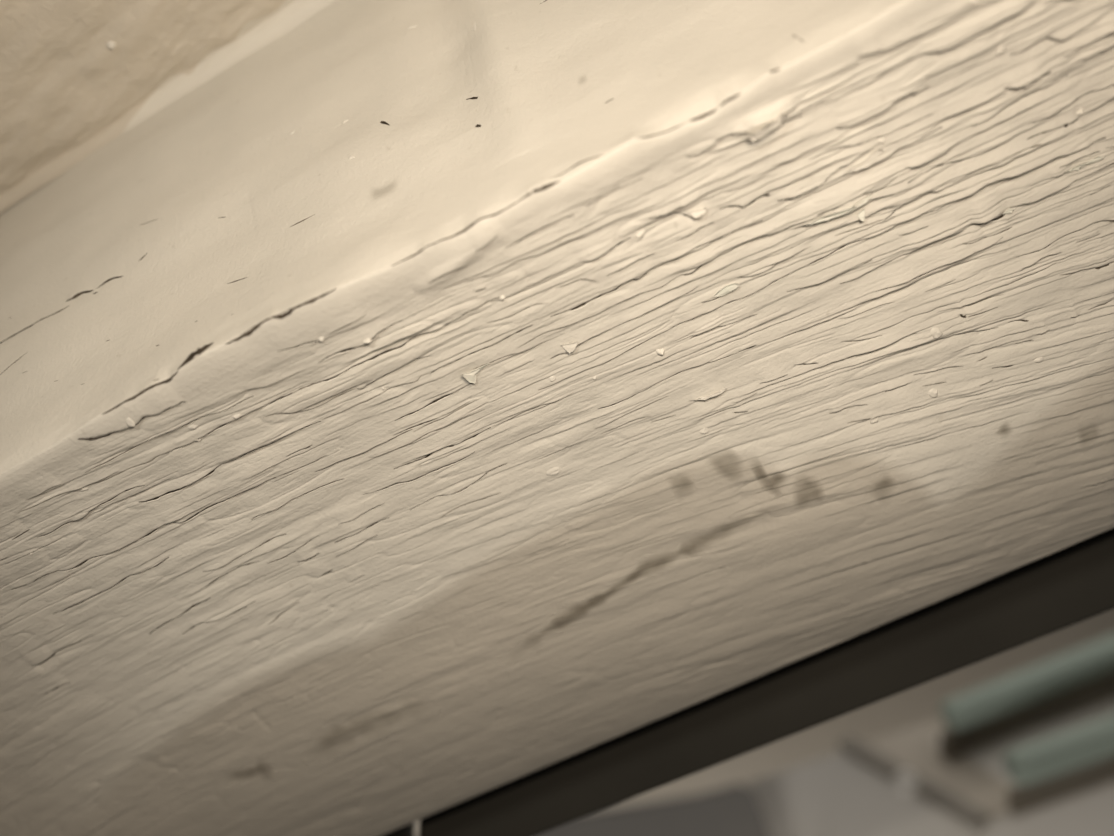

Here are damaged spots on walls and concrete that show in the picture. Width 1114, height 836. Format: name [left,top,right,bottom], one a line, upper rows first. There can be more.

crack [0,18,1114,635]
crack [32,640,82,667]